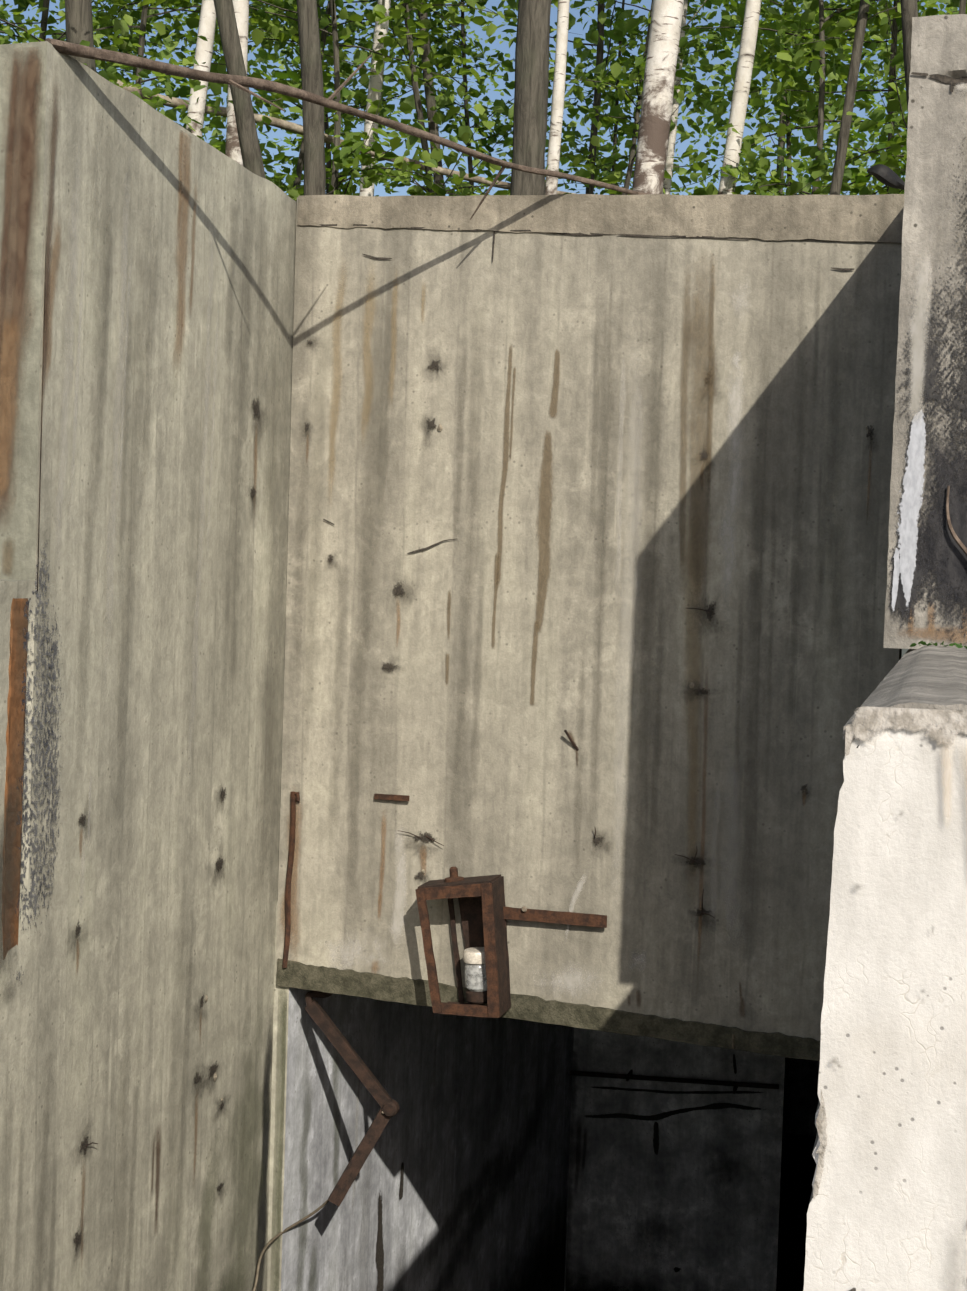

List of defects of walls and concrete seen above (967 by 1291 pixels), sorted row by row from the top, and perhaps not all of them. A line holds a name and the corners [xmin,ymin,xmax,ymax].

rust [0,55,39,511]
rust [37,110,58,587]
spalling [845,706,967,756]
crack [376,1162,404,1291]